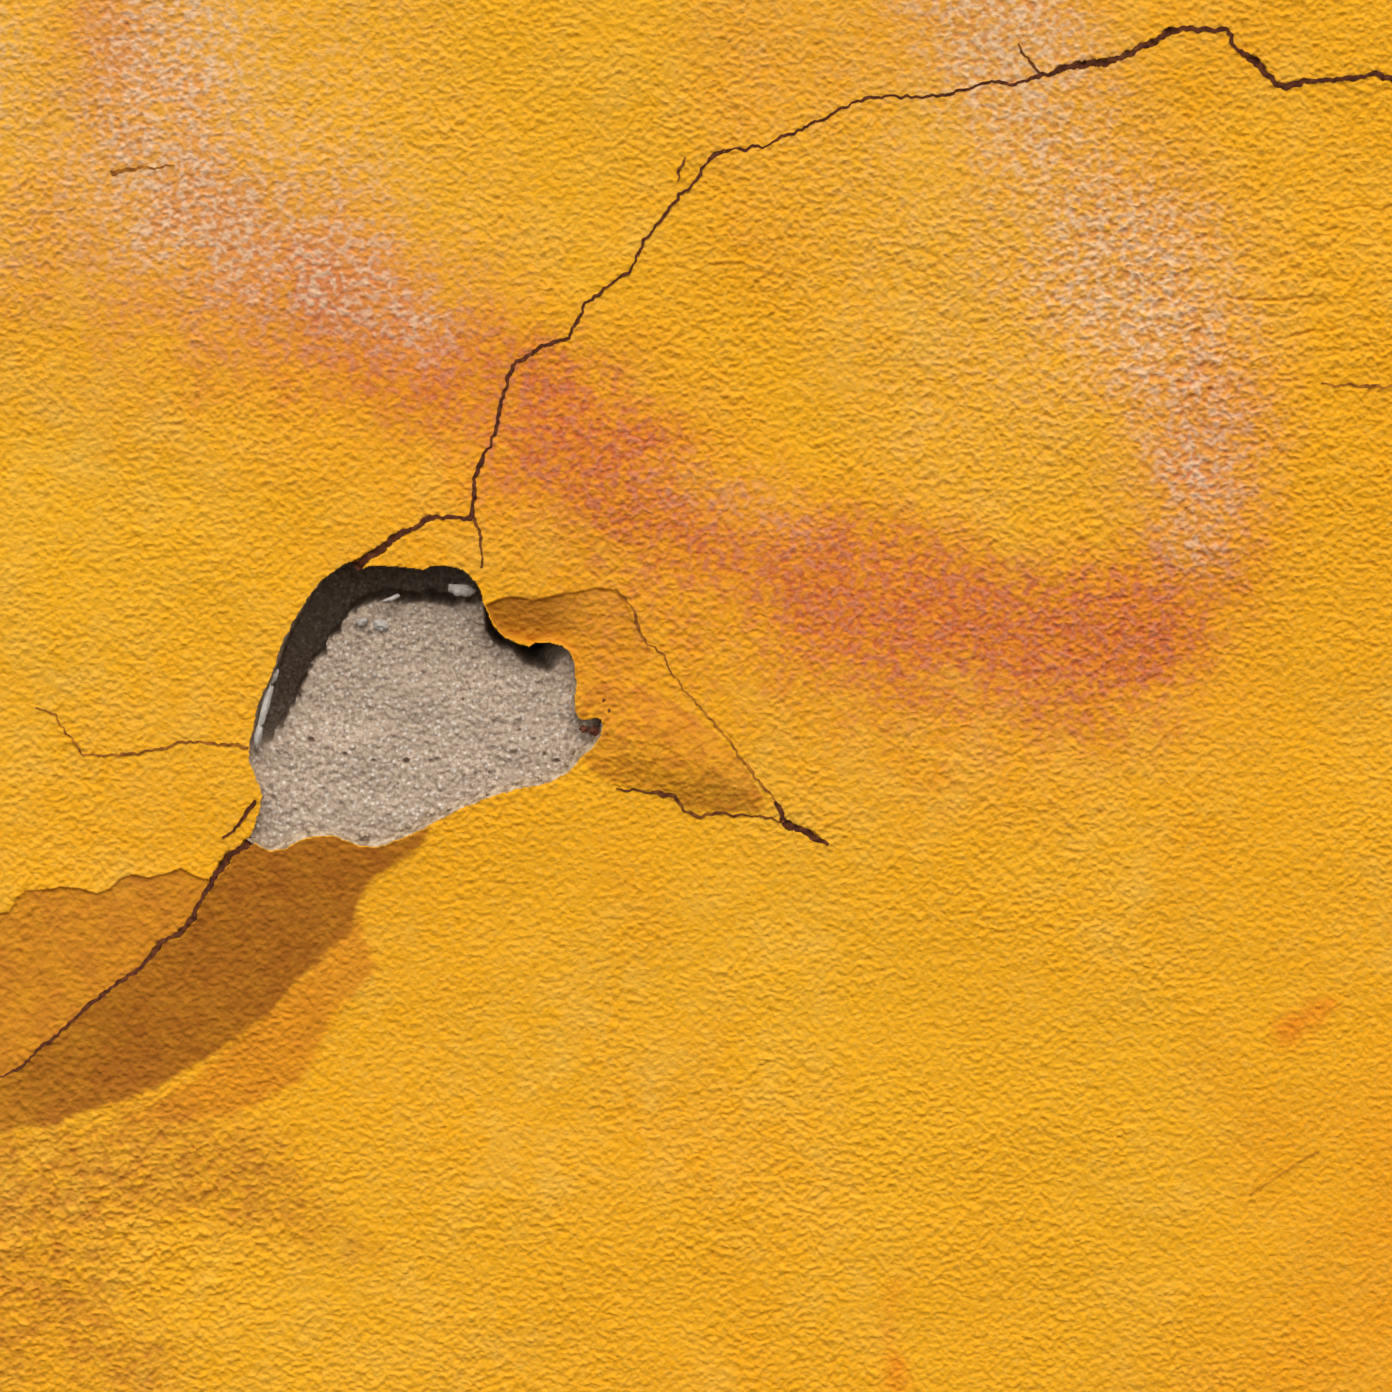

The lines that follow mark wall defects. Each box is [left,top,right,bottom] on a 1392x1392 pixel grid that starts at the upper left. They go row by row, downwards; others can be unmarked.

crack [110,164,175,176]
crack [352,25,1392,571]
crack [35,707,248,757]
spalling [247,561,611,851]
crack [615,589,829,846]
crack [0,799,257,1078]